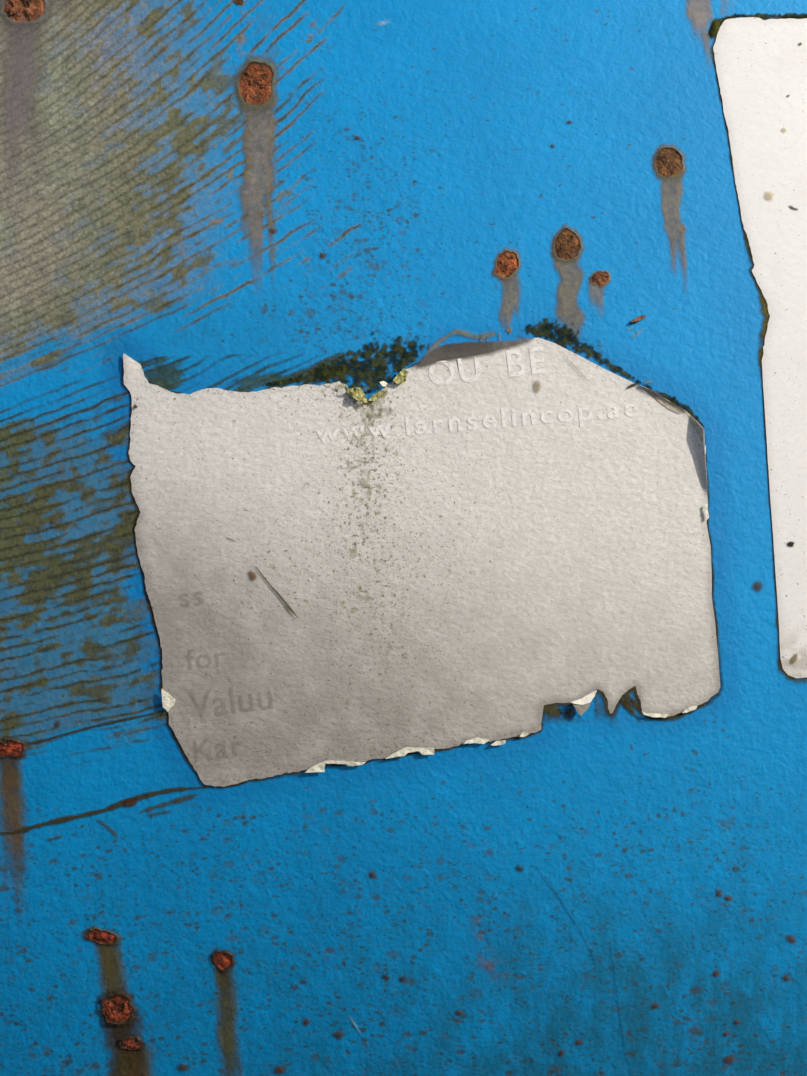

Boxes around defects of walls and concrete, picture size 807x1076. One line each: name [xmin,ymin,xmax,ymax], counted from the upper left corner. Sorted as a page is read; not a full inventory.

rust [0,0,51,139]
rust [234,57,278,250]
rust [653,145,686,267]
rust [493,248,521,324]
rust [552,226,611,332]
rust [0,737,28,868]
rust [84,926,150,1076]
rust [210,949,236,1076]